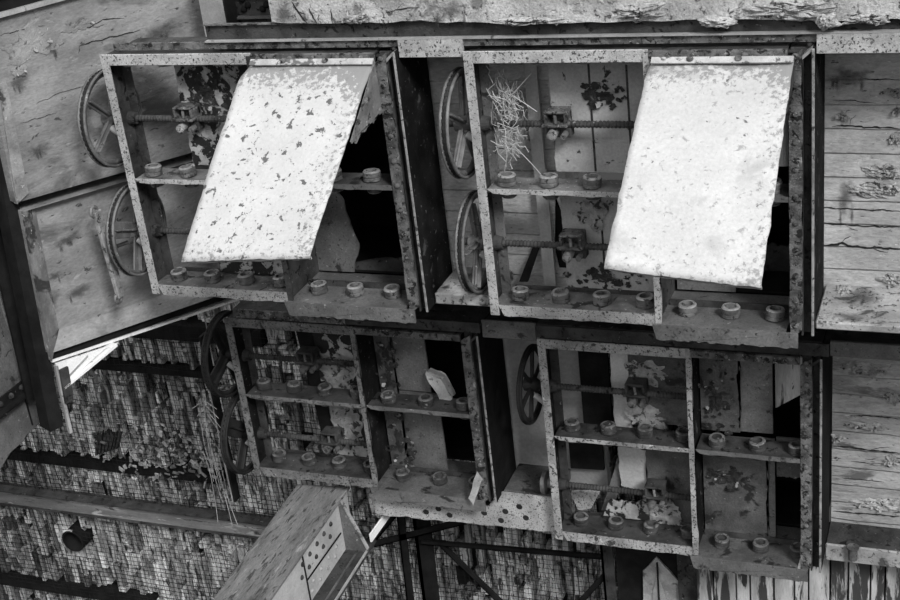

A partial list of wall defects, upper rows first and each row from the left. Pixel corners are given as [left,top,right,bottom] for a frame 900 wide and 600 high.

spalling [612,2,666,23]
spalling [742,0,839,22]
spalling [841,14,890,26]
peeling [187,72,229,114]
peeling [580,79,627,111]